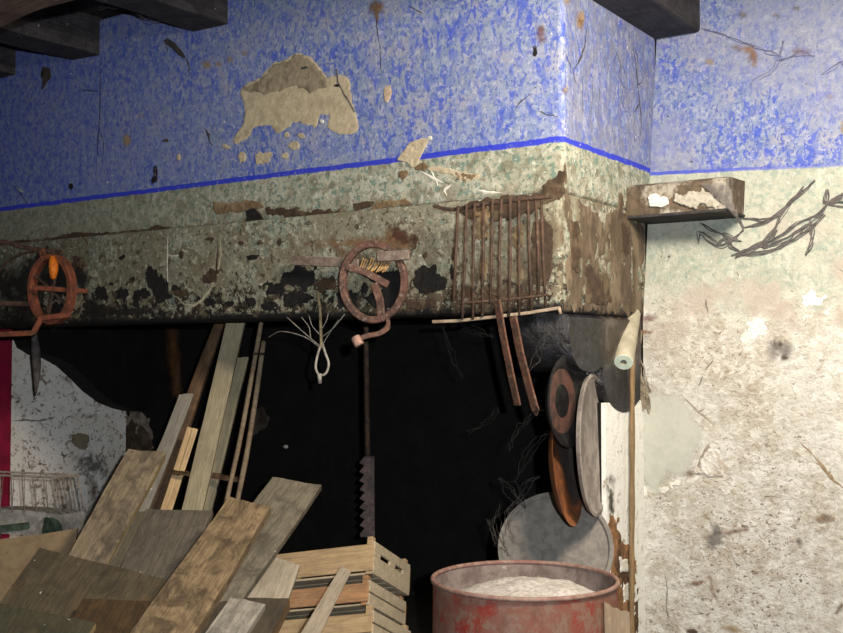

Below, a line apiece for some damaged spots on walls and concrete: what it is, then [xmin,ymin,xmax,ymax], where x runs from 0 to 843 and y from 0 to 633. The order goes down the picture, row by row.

flaking render [222,52,359,165]
flaking render [397,136,481,196]
peeling [94,265,190,310]
peeling [203,268,220,283]
peeling [204,298,234,308]
flaking render [608,513,639,633]